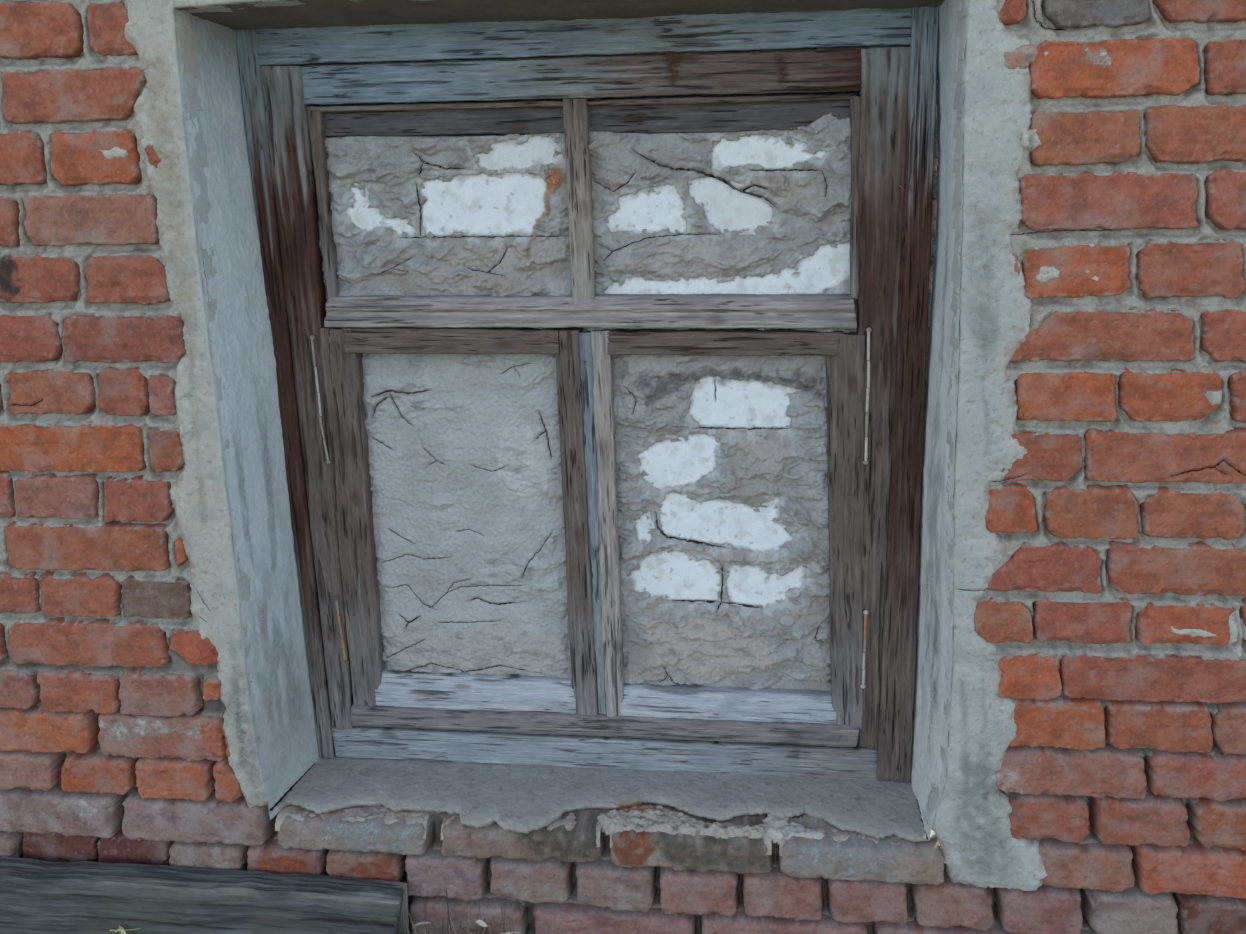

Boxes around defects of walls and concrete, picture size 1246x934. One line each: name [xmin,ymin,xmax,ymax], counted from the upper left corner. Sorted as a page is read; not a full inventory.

spalling [346,133,564,239]
crack [377,154,558,276]
corrosion [527,168,563,257]
crack [604,234,716,260]
crack [596,151,827,208]
spalling [604,134,826,235]
spalling [598,240,850,294]
crack [373,390,506,472]
spalling [627,375,807,609]
crack [1170,460,1246,477]
crack [381,529,552,673]
spalling [597,805,825,844]